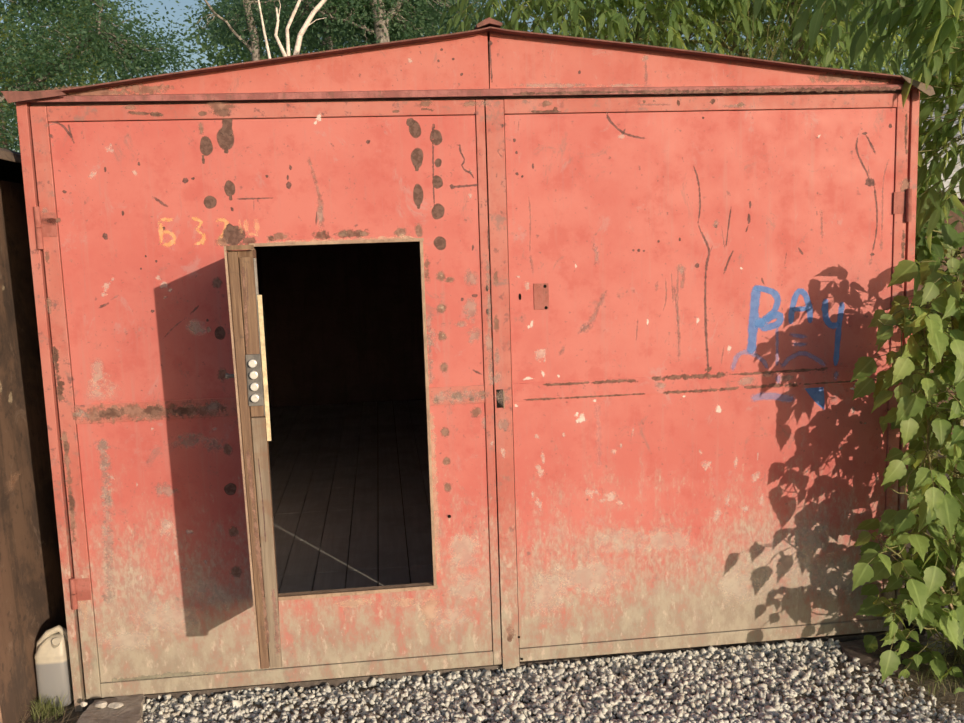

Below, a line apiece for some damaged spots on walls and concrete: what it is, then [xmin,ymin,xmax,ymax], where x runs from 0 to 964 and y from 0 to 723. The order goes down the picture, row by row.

corrosion [52,346,65,401]
corrosion [72,400,228,424]
corrosion [525,379,645,401]
corrosion [652,367,858,394]
damp [98,440,114,603]
damp [762,527,850,590]